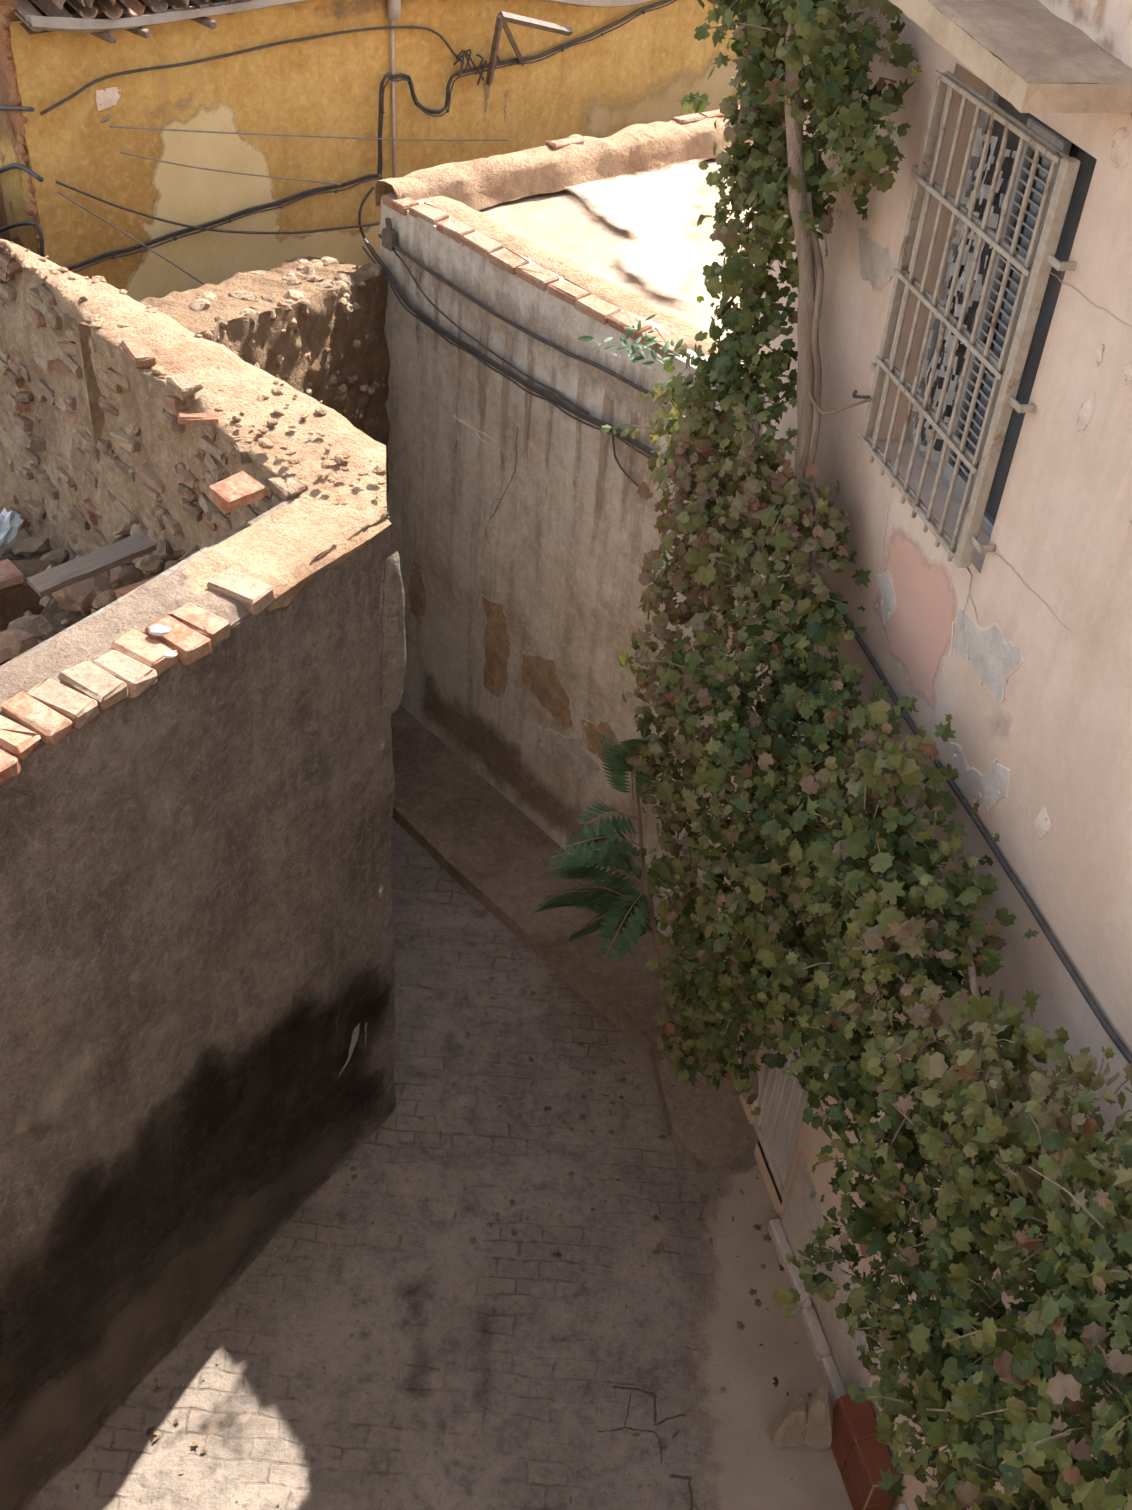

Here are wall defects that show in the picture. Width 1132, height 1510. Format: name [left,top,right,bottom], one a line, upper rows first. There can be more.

peeling [877,571,897,626]
peeling [481,595,623,764]
peeling [952,607,1024,707]
peeling [950,742,1011,812]